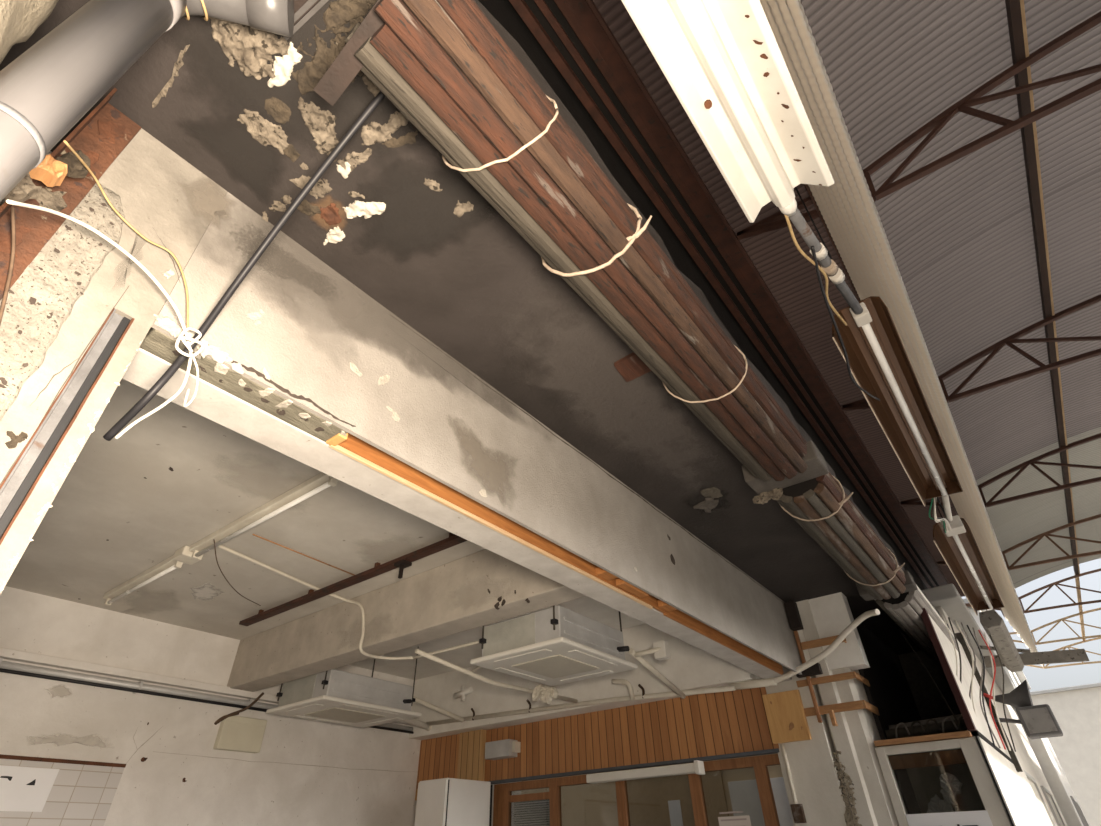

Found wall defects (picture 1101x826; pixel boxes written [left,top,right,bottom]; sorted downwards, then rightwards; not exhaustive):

flaking render [208,0,418,222]
flaking render [323,191,386,245]
spalling [423,178,443,192]
spalling [453,200,474,218]
water stain [455,423,511,502]